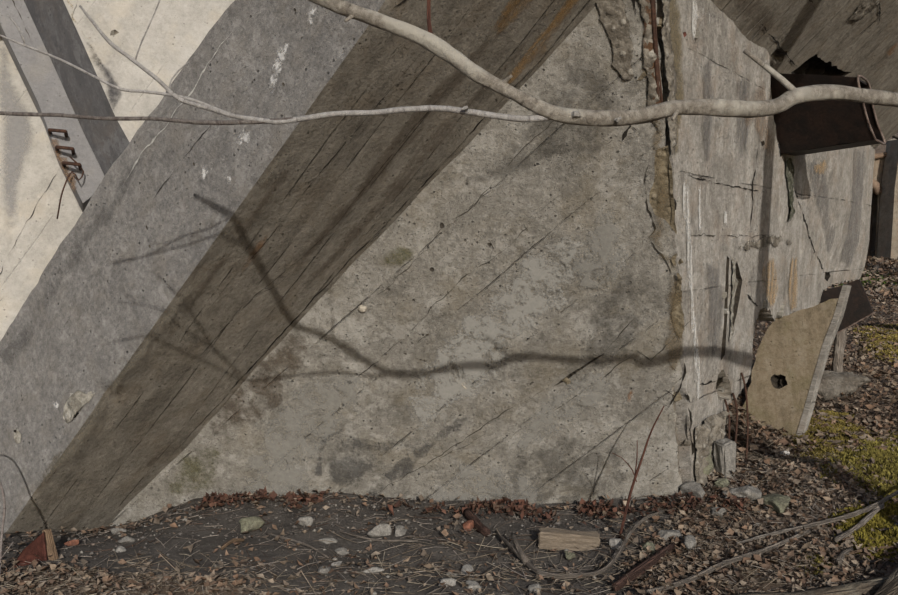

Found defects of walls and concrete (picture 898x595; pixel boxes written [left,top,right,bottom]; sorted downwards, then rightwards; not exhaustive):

spalling [770,49,785,64]
spalling [791,54,851,76]
crack [607,108,640,144]
crack [683,152,771,238]
crack [793,186,823,269]
crack [370,318,716,496]
spalling [668,253,742,487]